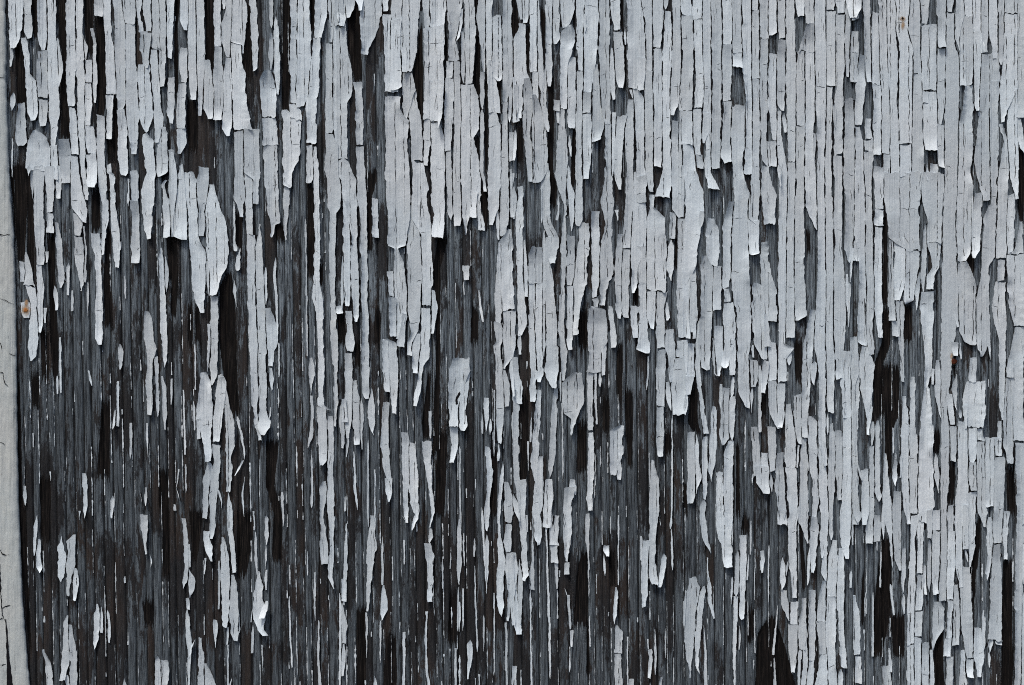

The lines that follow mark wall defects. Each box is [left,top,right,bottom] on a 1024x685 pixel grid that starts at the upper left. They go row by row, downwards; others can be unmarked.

peeling [140,248,173,430]
peeling [36,534,139,685]
peeling [101,374,133,528]
peeling [178,518,216,685]
peeling [241,463,270,685]
peeling [287,528,329,685]
peeling [338,497,348,685]
peeling [399,411,440,602]
peeling [441,354,476,685]
peeling [589,506,674,685]
peeling [683,558,715,685]
peeling [853,570,874,685]